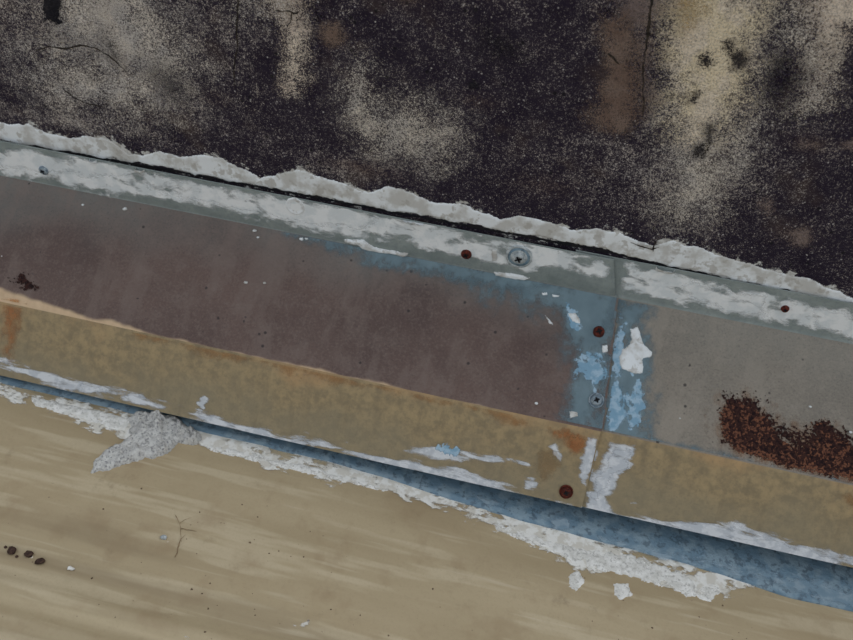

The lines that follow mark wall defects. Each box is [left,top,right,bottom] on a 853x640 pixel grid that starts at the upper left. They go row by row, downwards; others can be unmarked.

crack [36,45,129,76]
corrosion [7,272,39,291]
corrosion [717,390,853,481]